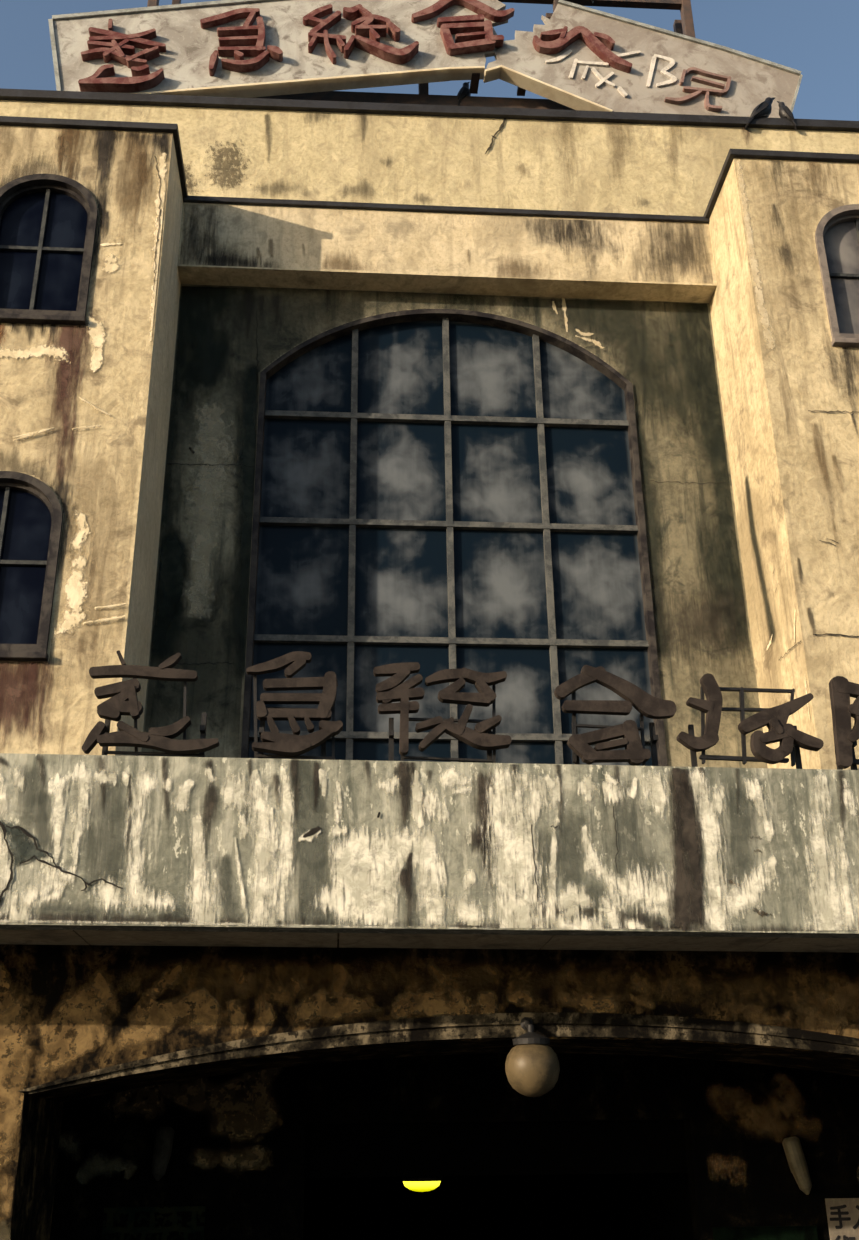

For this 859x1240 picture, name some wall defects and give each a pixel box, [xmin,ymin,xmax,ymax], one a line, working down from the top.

crack [485,118,507,154]
water stain [58,128,168,275]
peeling [0,344,71,363]
peeling [88,316,105,372]
water stain [150,286,279,657]
peeling [54,510,90,634]
rust [0,658,52,737]
crack [0,821,123,901]
water stain [273,759,338,925]
water stain [472,773,496,876]
water stain [518,765,706,931]
peeling [805,775,858,931]